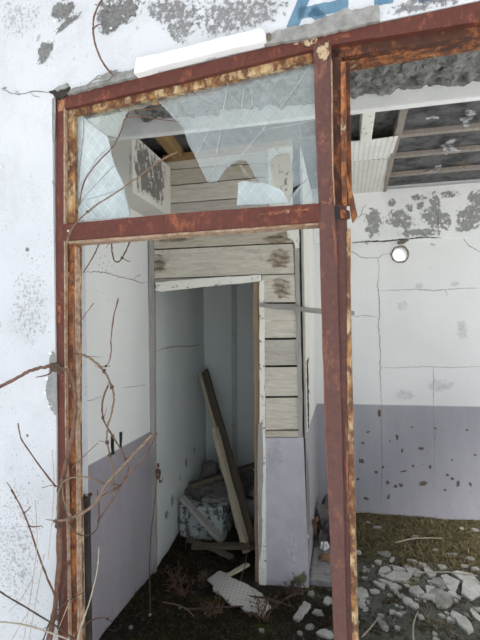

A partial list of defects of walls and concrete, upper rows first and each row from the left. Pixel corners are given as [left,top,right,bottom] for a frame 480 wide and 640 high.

peeling [35,0,82,64]
peeling [95,0,288,43]
crack [1,88,49,97]
spalling [135,69,315,122]
spalling [350,50,480,99]
peeling [364,189,480,238]
crack [85,271,145,283]
crack [351,206,478,500]
flaking render [44,352,57,415]